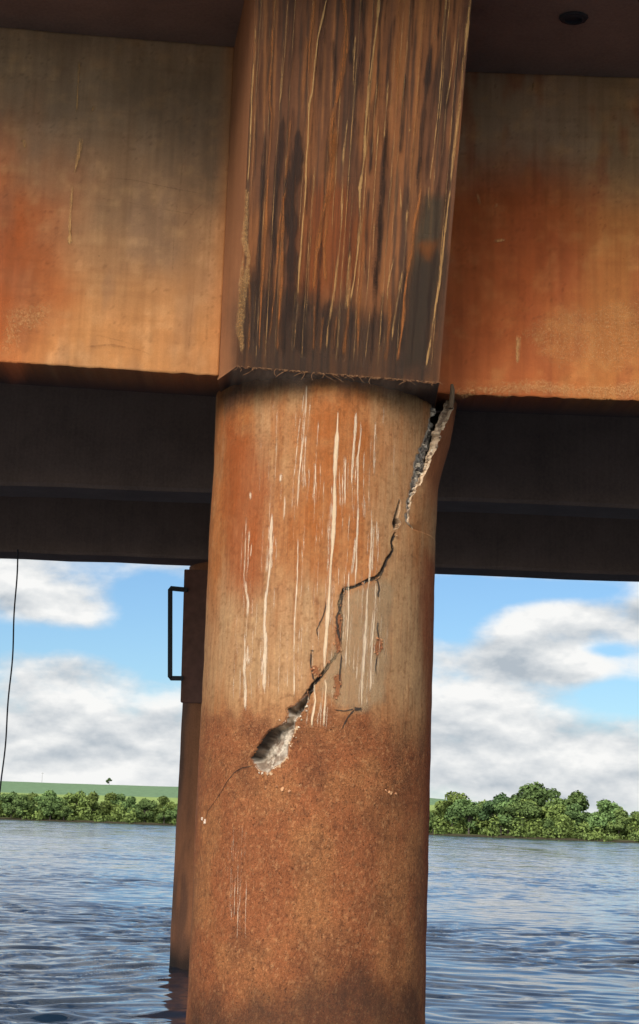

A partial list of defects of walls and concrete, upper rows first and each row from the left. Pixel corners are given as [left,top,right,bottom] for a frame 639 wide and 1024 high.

damp [225,0,470,412]
efflorescence [243,414,387,724]
crack [304,407,433,729]
spalling [392,400,456,537]
crack [201,766,250,824]
spalling [249,693,311,792]
corrosion [423,563,434,924]